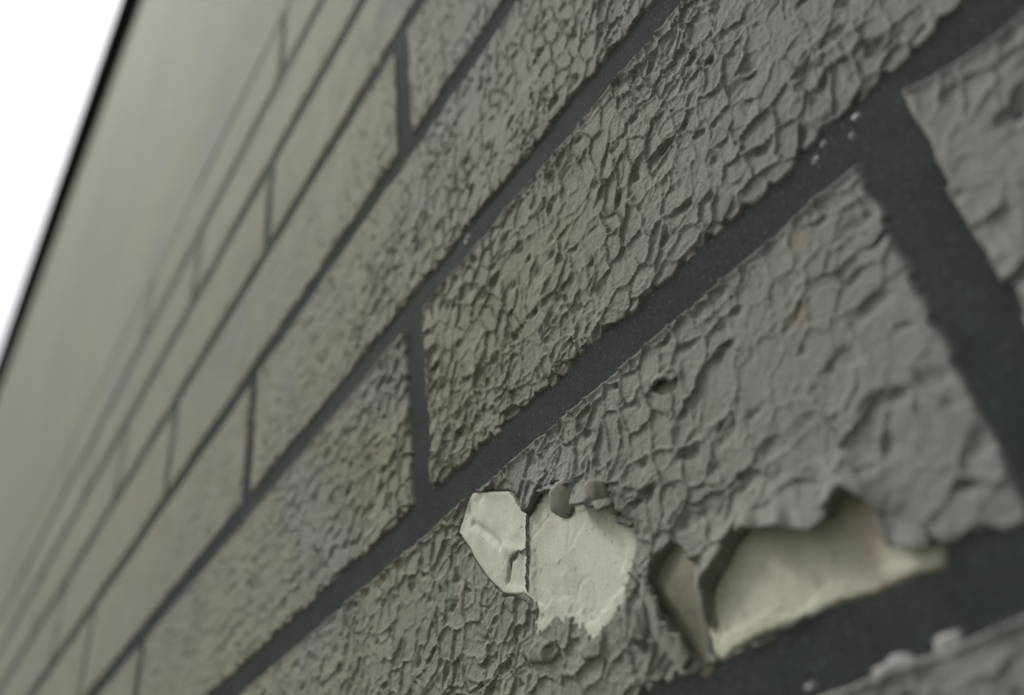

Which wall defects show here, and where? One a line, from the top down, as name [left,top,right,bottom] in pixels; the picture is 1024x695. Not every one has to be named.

crack [510,491,550,592]
peeling [460,477,947,678]